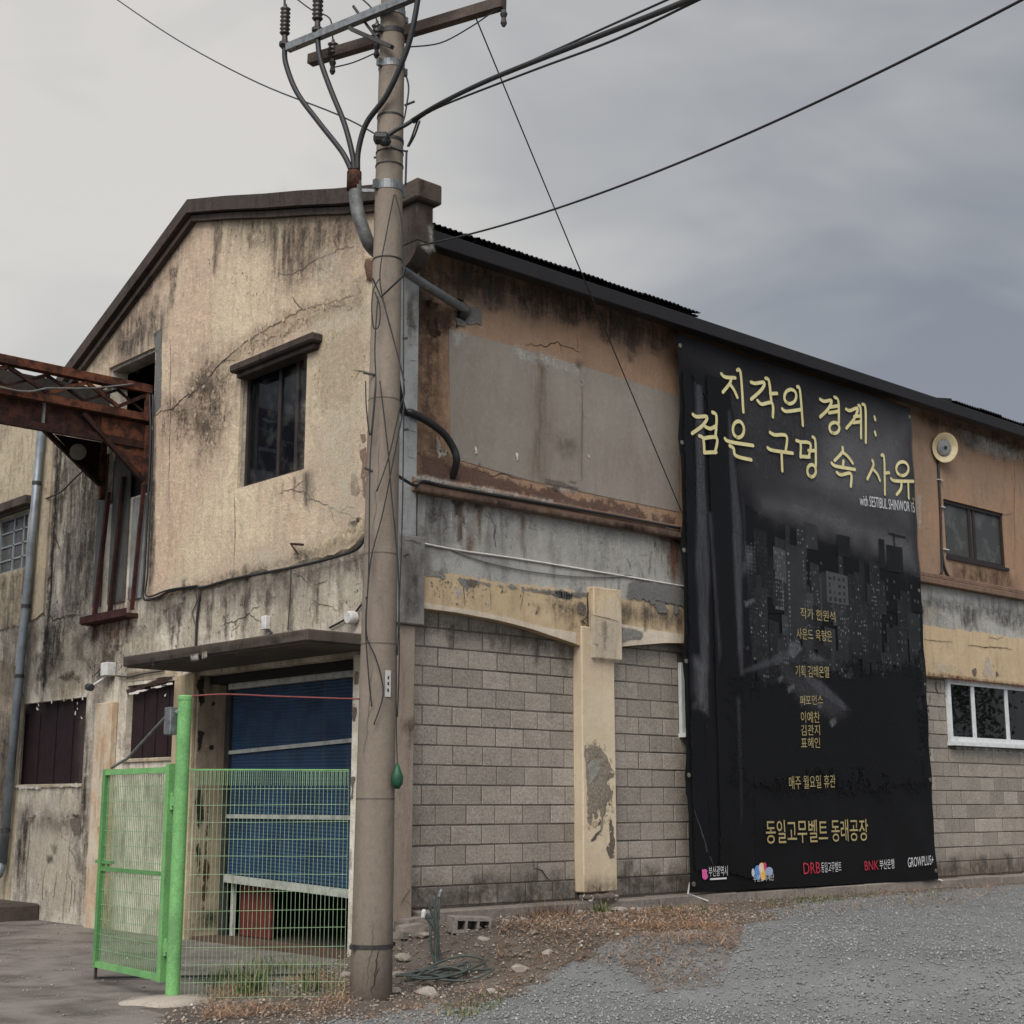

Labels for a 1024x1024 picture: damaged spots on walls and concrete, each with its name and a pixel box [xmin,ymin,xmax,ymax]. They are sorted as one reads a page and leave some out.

water stain [209,218,355,296]
water stain [162,362,227,436]
crack [155,233,353,474]
crack [278,445,380,528]
spalling [416,436,676,529]
water stain [0,447,144,709]
peeling [425,569,588,614]
water stain [79,716,88,870]
peeling [584,739,615,858]
water stain [16,815,28,883]